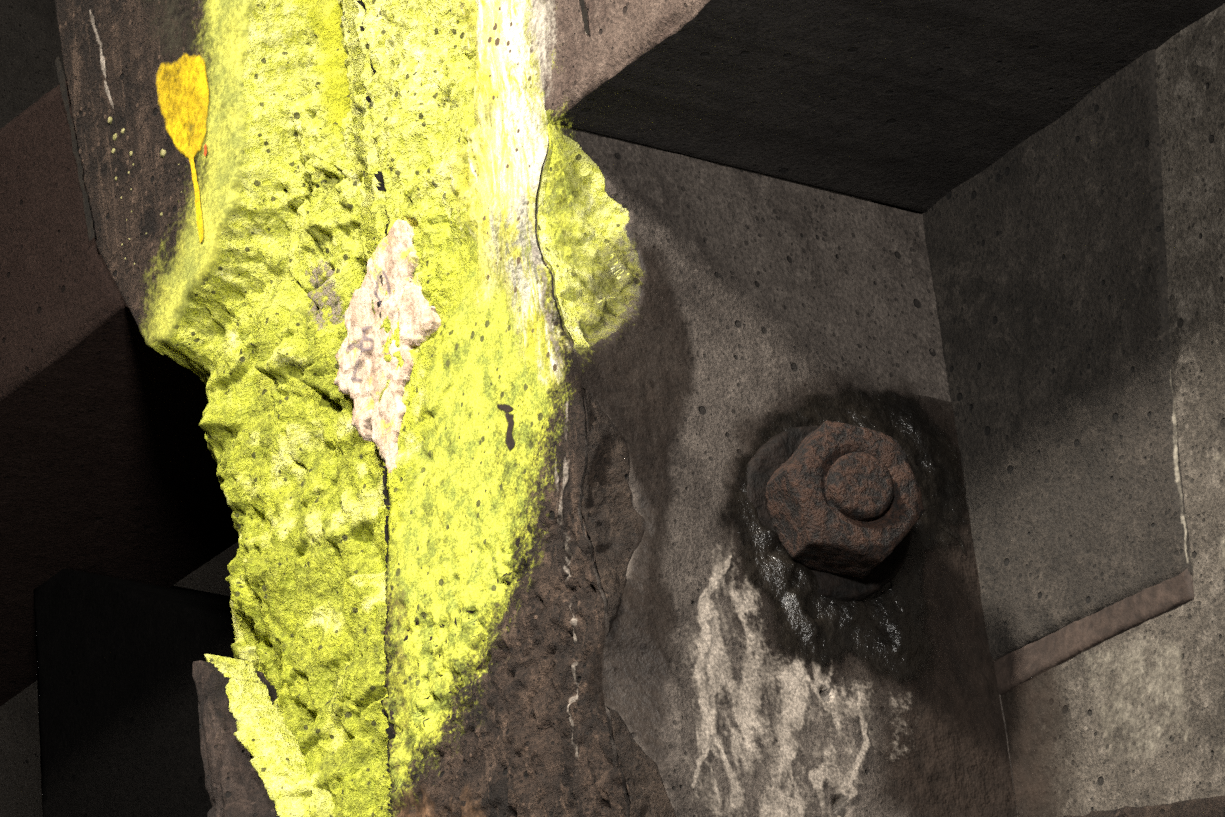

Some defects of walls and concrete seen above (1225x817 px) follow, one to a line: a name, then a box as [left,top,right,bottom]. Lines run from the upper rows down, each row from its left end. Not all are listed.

spalling [150,0,478,817]
crack [381,459,396,817]
efflorescence [688,548,871,817]